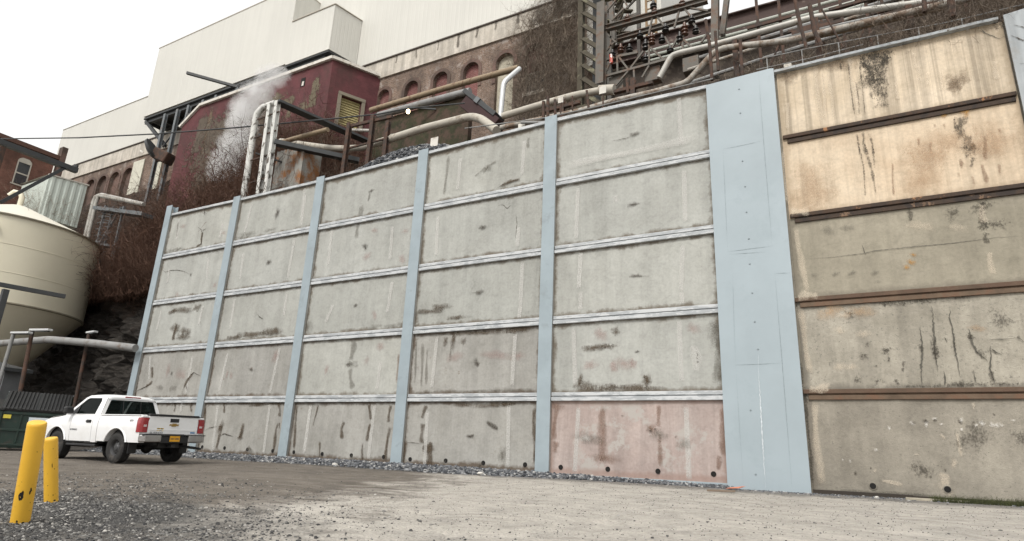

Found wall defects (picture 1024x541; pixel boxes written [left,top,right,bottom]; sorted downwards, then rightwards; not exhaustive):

leakage [831,44,902,113]
leakage [954,118,976,165]